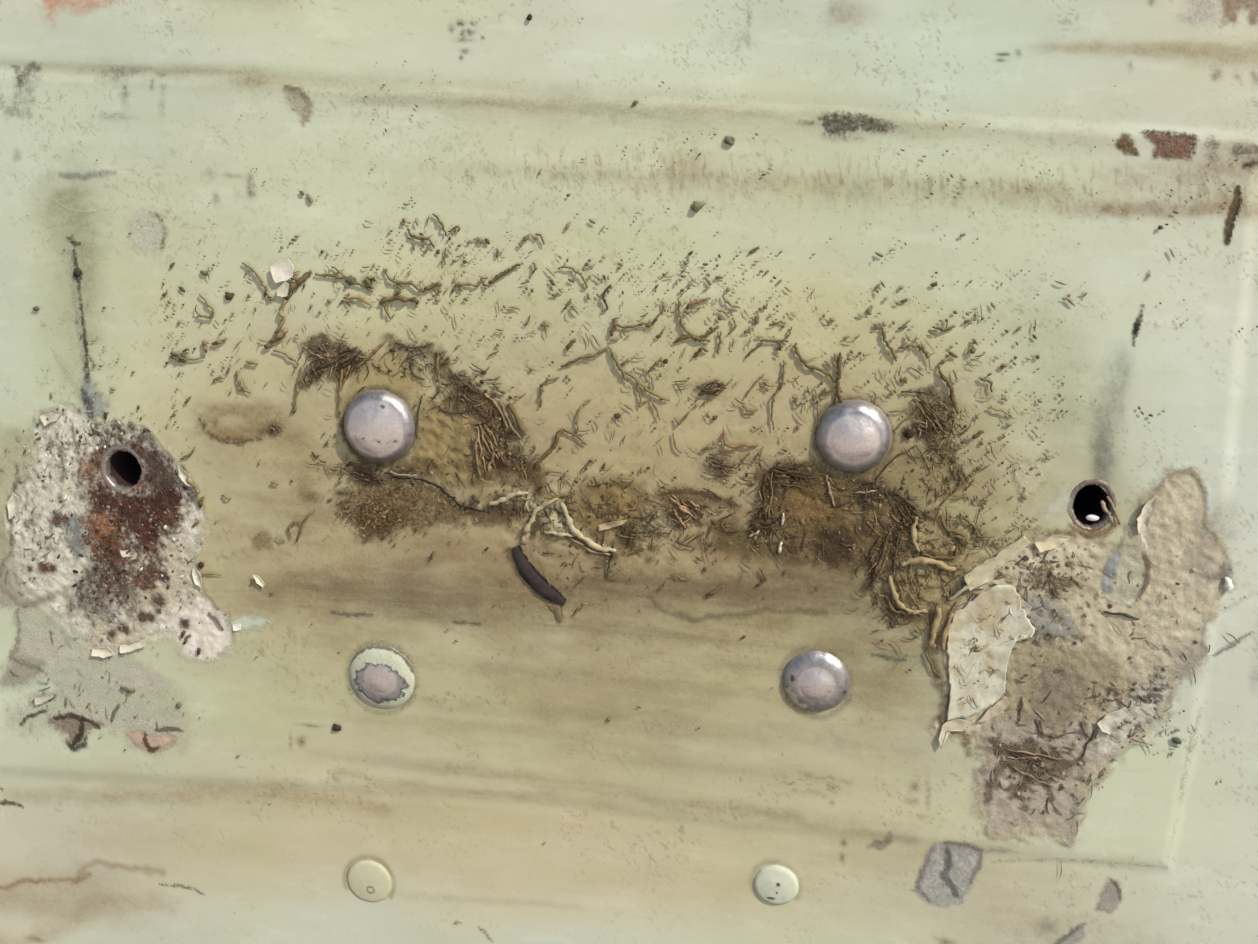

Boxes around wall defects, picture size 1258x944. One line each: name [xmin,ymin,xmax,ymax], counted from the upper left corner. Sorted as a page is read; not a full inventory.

water stain [199,408,271,446]
peeling [1013,460,1049,497]
corrosion [27,441,204,638]
peeling [0,381,271,741]
water stain [390,520,643,610]
water stain [656,510,892,604]
peeling [926,467,1241,852]
peeling [915,842,982,906]
peeling [1098,879,1121,913]